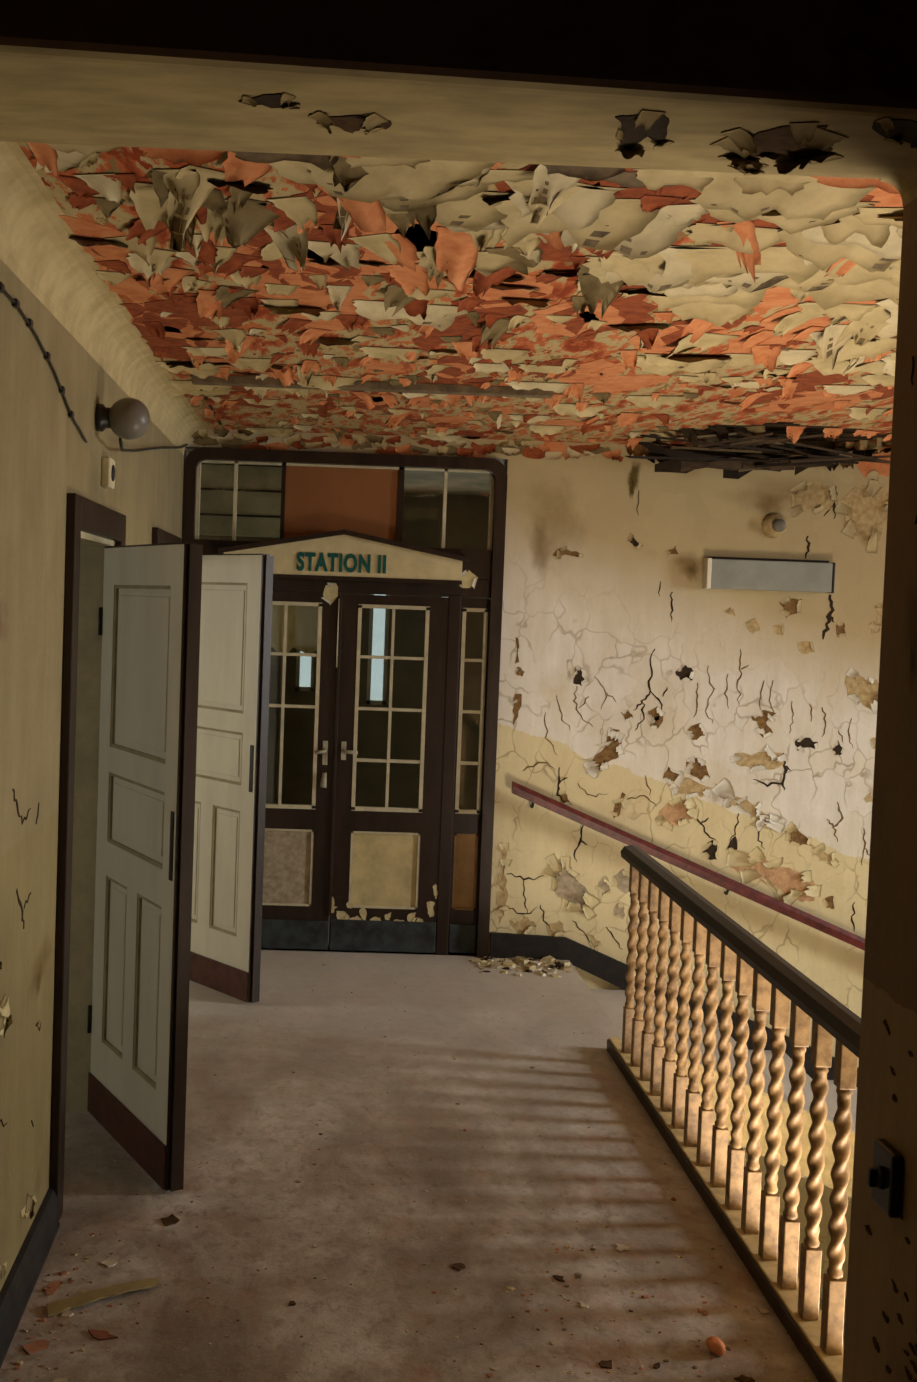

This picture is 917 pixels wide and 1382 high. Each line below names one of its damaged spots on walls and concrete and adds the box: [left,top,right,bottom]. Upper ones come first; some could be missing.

peeling [26,109,904,462]
peeling [789,447,891,553]
peeling [583,707,666,779]
peeling [675,665,696,682]
crack [523,581,853,861]
peeling [845,667,879,714]
peeling [610,792,626,818]
spalling [655,709,844,909]
crack [827,802,870,865]
peeling [331,884,438,922]
spalling [492,842,629,950]
crack [508,873,623,950]